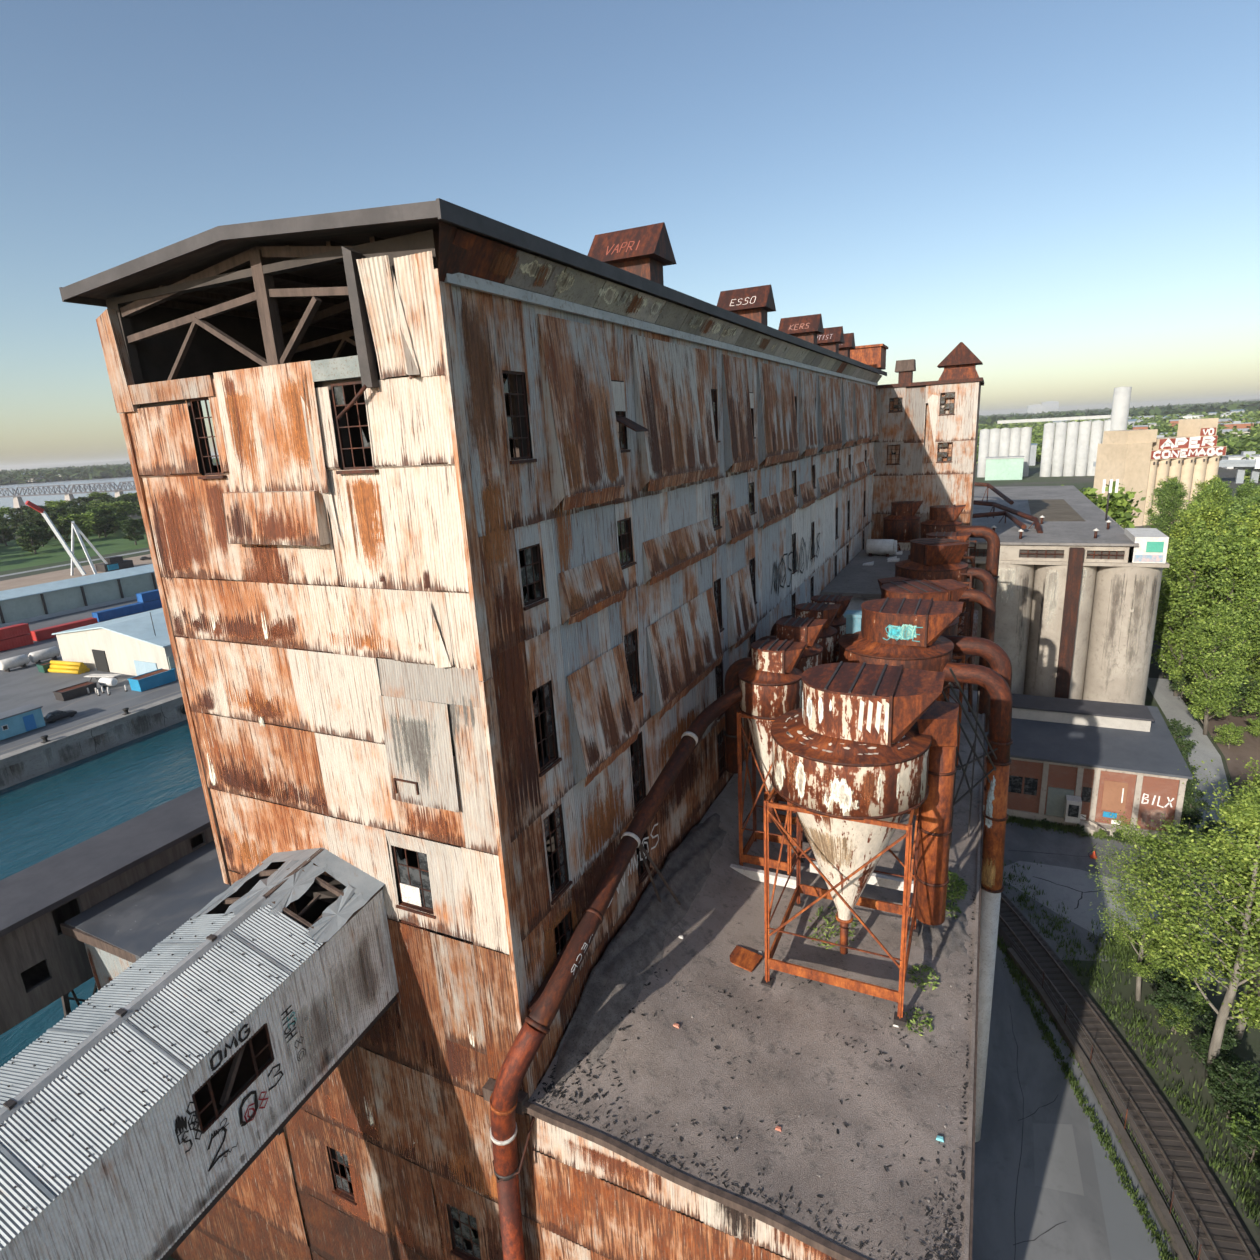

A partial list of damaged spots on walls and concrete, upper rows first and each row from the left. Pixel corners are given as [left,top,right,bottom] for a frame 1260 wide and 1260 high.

corrosion [224,378,257,479]
corrosion [273,374,312,469]
corrosion [643,363,716,474]
corrosion [346,478,386,588]
corrosion [171,606,295,643]
corrosion [419,696,474,744]
peeling [783,692,909,755]
corrosion [210,753,325,806]
peeling [775,761,806,798]
peeling [824,778,859,816]
corrosion [569,1140,662,1191]
corrosion [719,1204,755,1243]